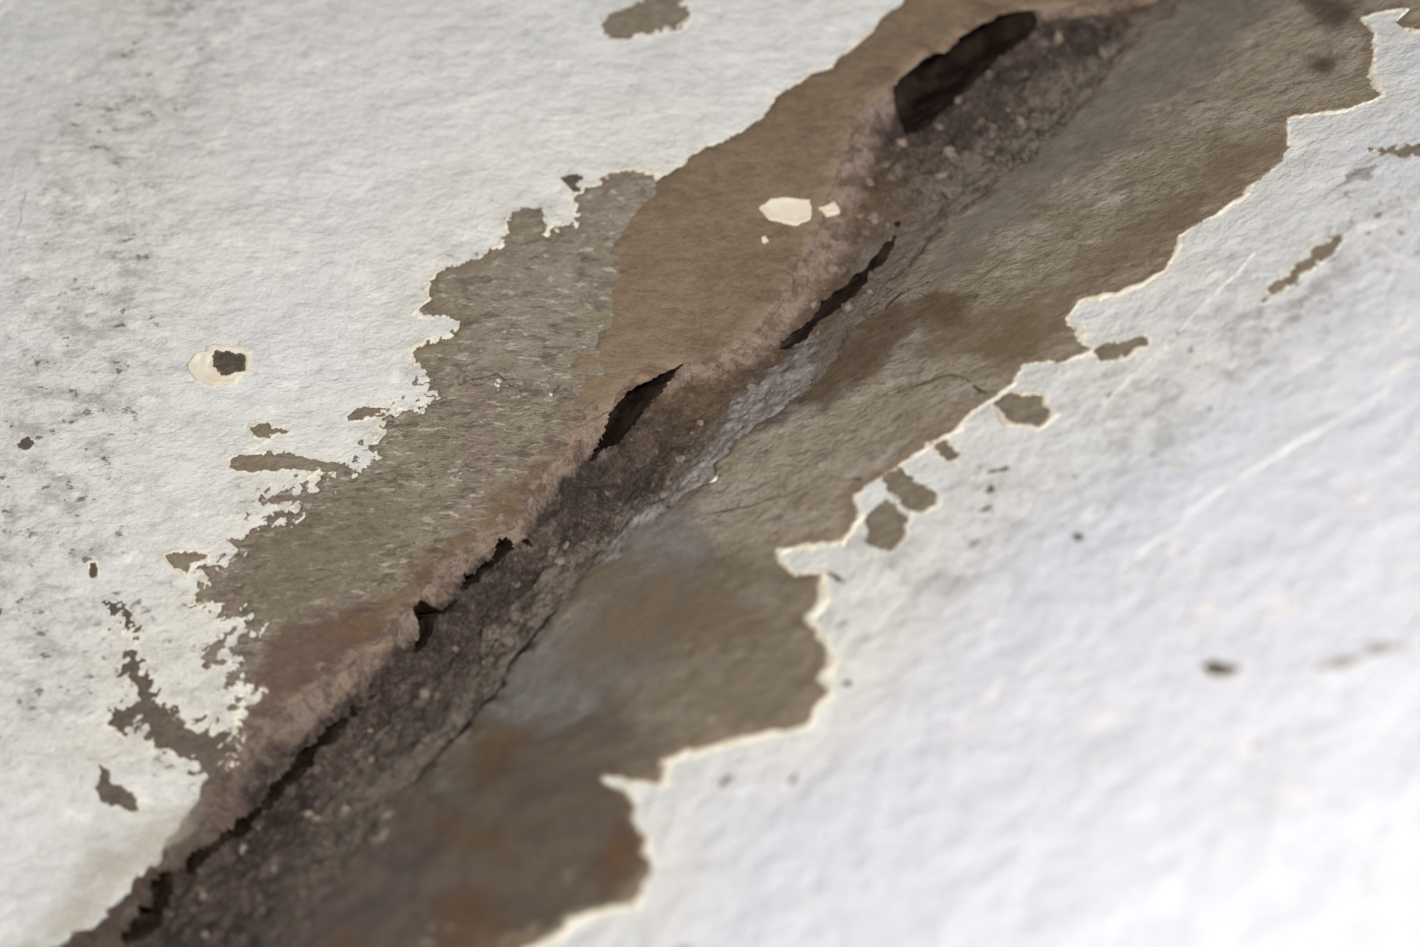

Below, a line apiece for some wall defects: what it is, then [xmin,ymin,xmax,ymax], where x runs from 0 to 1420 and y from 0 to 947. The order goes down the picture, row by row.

damp [1306,0,1351,25]
peeling [187,344,252,386]
crack [897,374,987,394]
peeling [17,436,34,450]
peeling [248,421,290,444]
peeling [322,0,1420,947]
crack [58,221,901,947]
peeling [102,596,144,646]
damp [283,293,969,947]
damp [256,608,373,715]
peeling [102,649,241,786]
peeling [94,763,147,816]